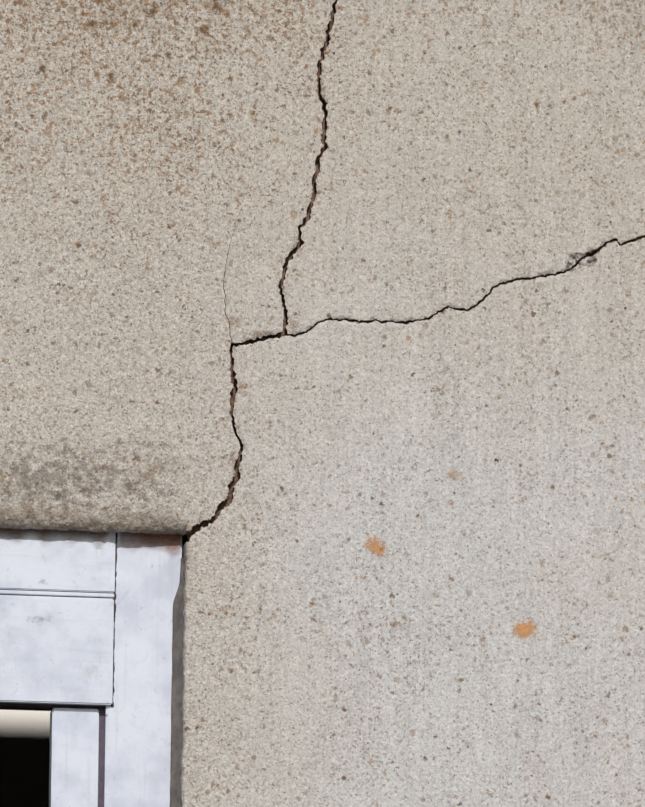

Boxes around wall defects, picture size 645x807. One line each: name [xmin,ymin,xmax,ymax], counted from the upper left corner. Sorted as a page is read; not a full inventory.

crack [188,0,645,542]
rust [364,535,385,556]
rust [514,621,536,638]